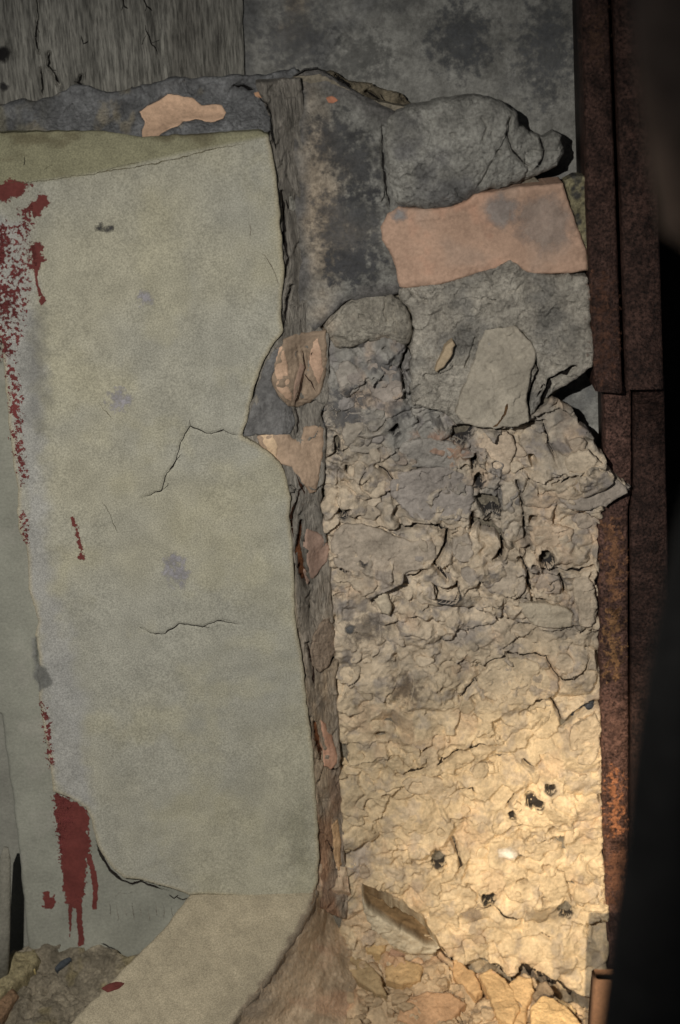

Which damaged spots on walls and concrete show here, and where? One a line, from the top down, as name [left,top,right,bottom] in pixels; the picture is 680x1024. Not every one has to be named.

crack [148,420,243,496]
spalling [243,77,631,1009]
crack [140,620,236,634]
crack [460,651,594,718]
corrosion [598,517,629,904]
crack [408,743,485,772]
crack [97,846,187,921]
crack [481,905,517,920]